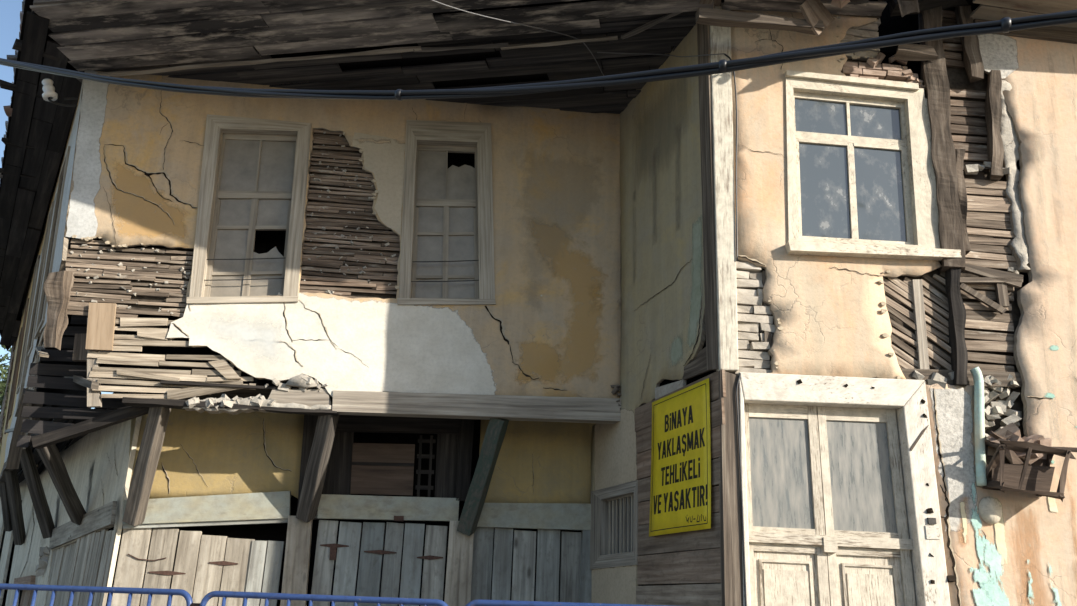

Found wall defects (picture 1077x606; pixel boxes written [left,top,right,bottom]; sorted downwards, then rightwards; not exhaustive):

spalling [836,16,923,88]
crack [103,90,204,243]
spalling [942,7,1021,372]
peeling [4,70,496,463]
crack [276,300,369,368]
crack [485,305,566,391]
spalling [732,261,784,375]
spalling [878,270,951,379]
crack [933,388,961,606]
peeling [930,388,1010,606]
peeling [1048,491,1058,512]
peeling [1048,563,1062,606]